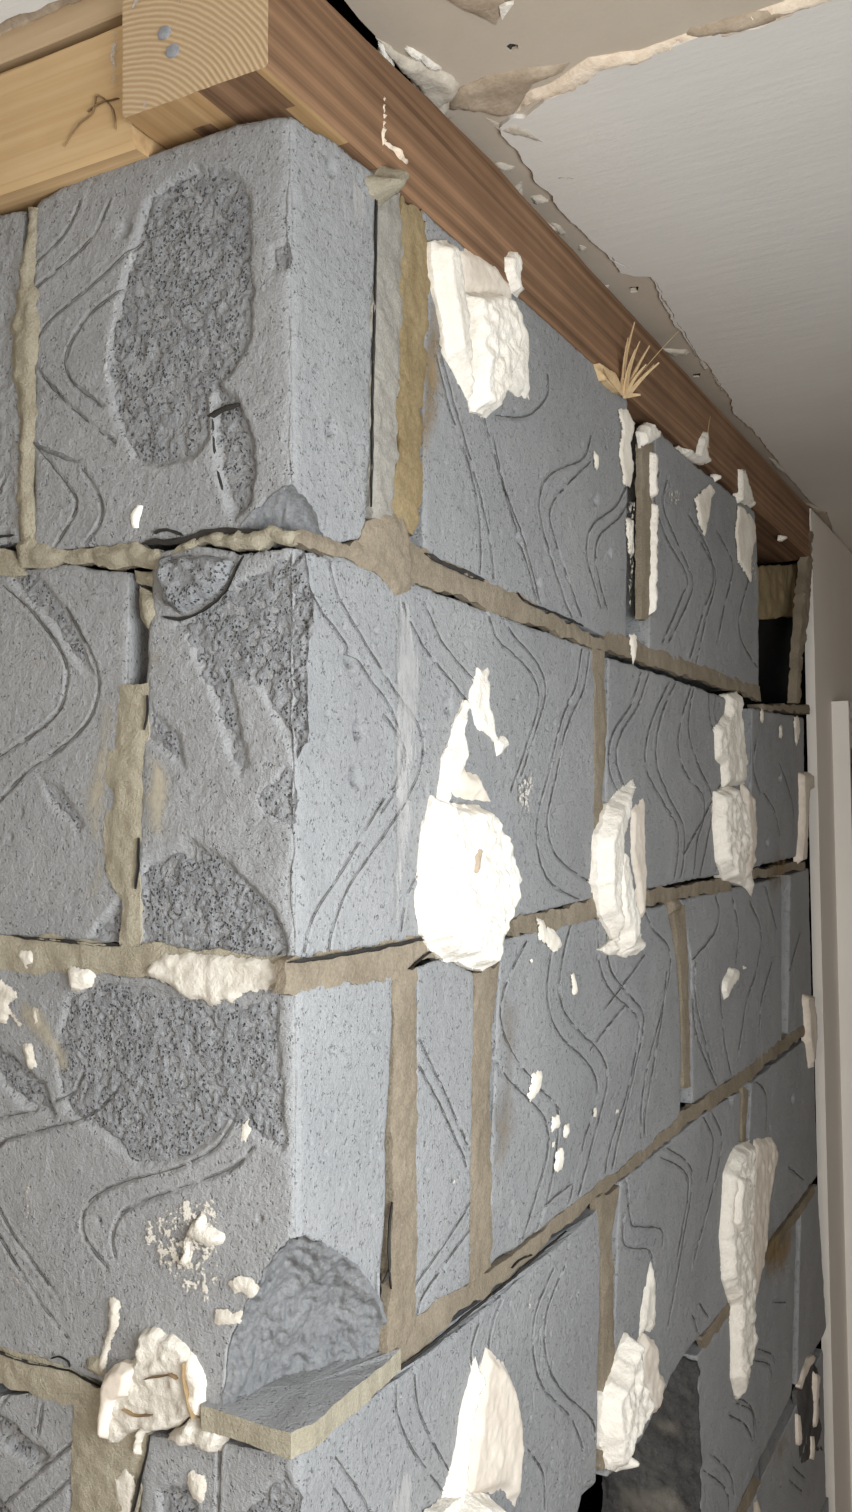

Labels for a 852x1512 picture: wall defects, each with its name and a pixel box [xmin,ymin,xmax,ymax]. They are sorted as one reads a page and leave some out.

flaking render [0,0,81,35]
flaking render [375,0,831,142]
damp [468,668,509,756]
crack [0,1351,198,1512]
spalling [601,1356,702,1512]